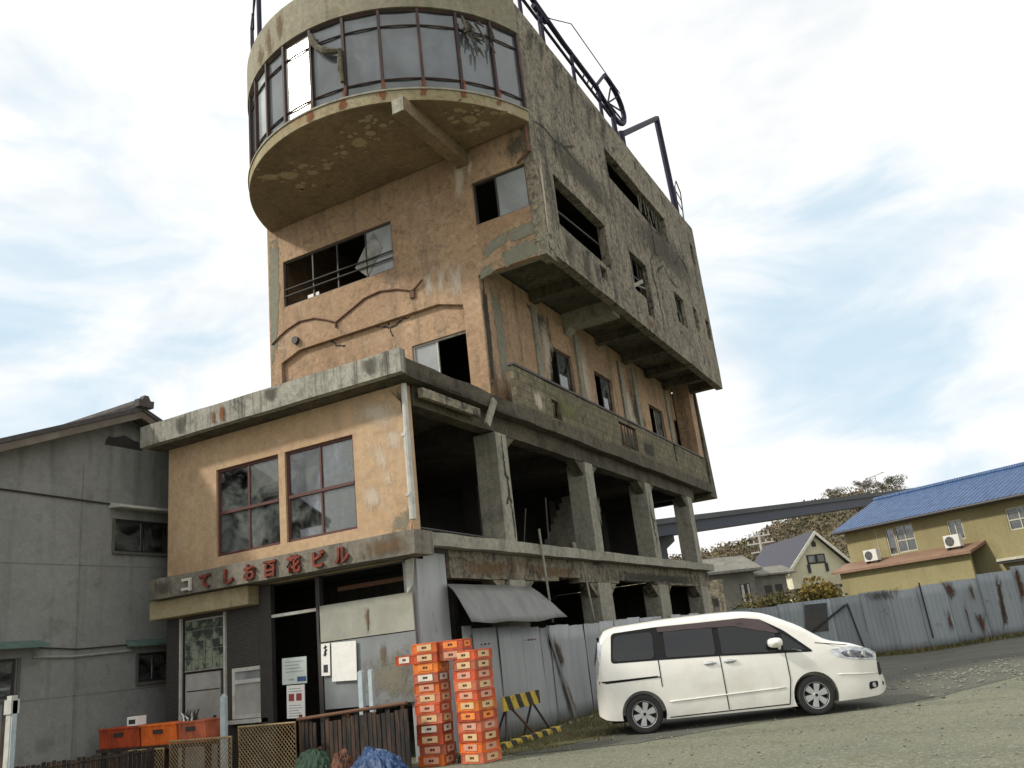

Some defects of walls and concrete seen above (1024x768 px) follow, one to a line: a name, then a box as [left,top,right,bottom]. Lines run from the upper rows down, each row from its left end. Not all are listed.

peeling [256,114,394,194]
water stain [552,139,610,210]
peeling [479,159,549,387]
crack [330,317,409,347]
rust [965,609,985,634]